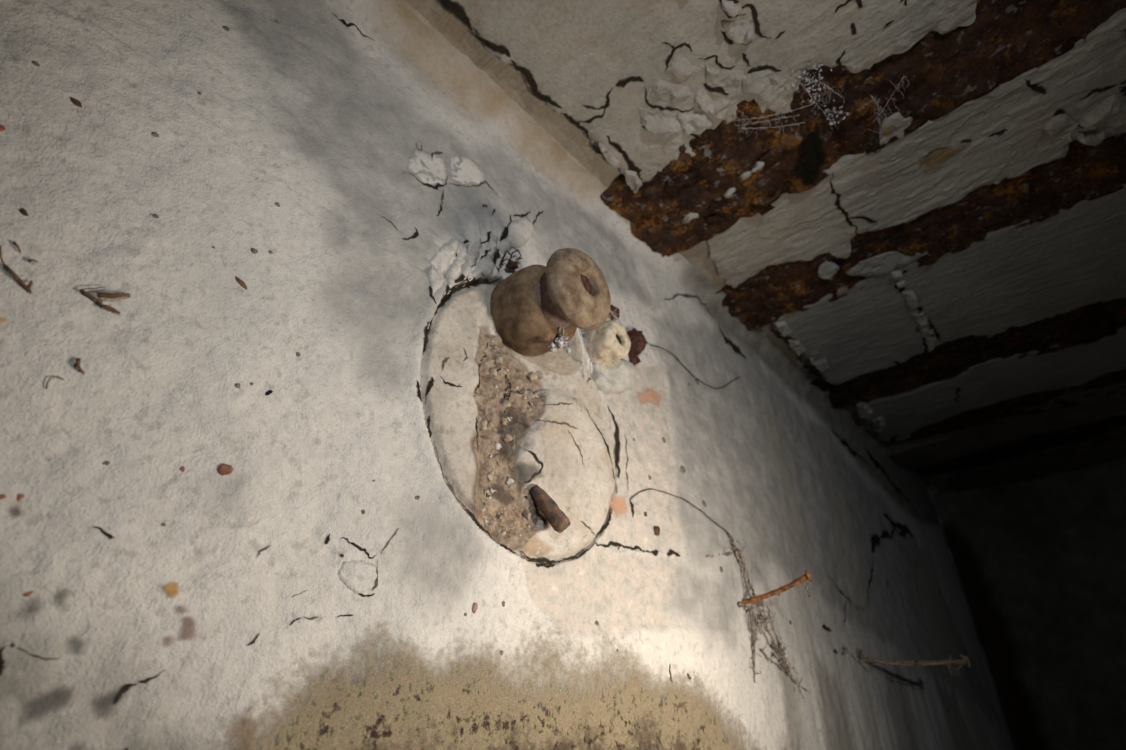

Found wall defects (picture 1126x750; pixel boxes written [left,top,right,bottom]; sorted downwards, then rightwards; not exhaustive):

spalling [722,0,755,44]
spalling [639,48,789,138]
spalling [1043,94,1126,146]
spalling [598,142,642,194]
rust [793,129,826,185]
spalling [818,251,937,352]
crack [384,143,680,568]
spalling [775,321,829,372]
crack [822,430,914,654]